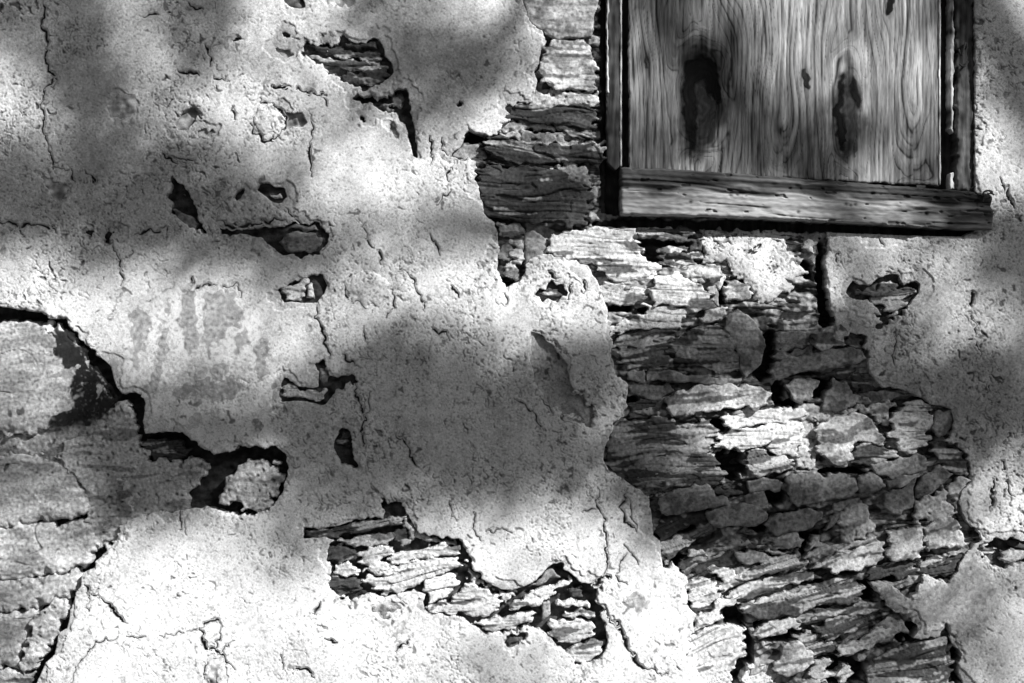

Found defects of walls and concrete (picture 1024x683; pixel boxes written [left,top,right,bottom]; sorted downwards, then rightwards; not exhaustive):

crack [38,0,97,185]
spalling [302,35,417,158]
spalling [168,178,207,234]
spalling [221,222,329,259]
spalling [278,274,327,303]
spalling [279,359,358,405]
spalling [452,0,1024,683]
spalling [0,306,289,683]
crack [71,585,235,683]
spalling [304,498,607,663]
crack [582,487,668,678]